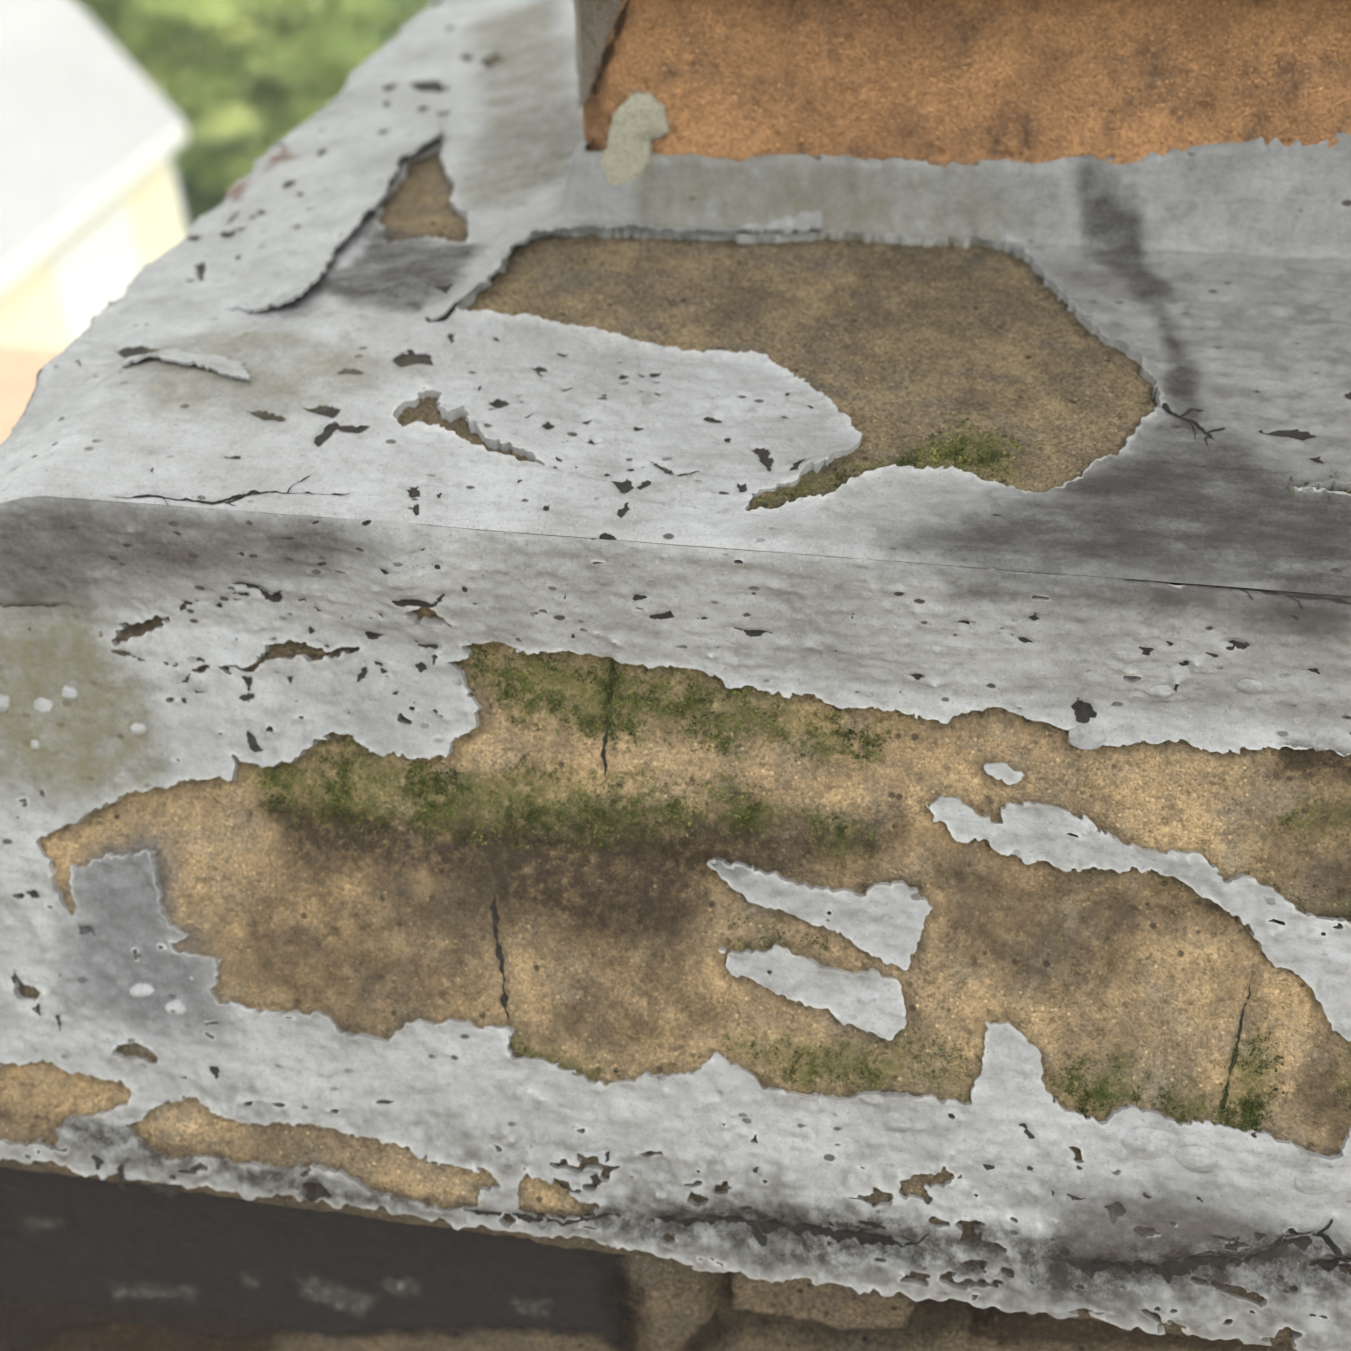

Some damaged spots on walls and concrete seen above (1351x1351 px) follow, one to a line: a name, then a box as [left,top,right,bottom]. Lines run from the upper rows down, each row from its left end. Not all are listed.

peeling [186,80,469,314]
water stain [1084,180,1165,297]
peeling [393,349,433,367]
peeling [424,168,1158,517]
peeling [302,405,370,447]
peeling [396,397,535,462]
peeling [111,600,199,661]
peeling [379,594,445,620]
peeling [39,626,1351,1156]
peeling [0,1060,132,1145]
peeling [130,1096,499,1209]
peeling [518,1173,600,1218]